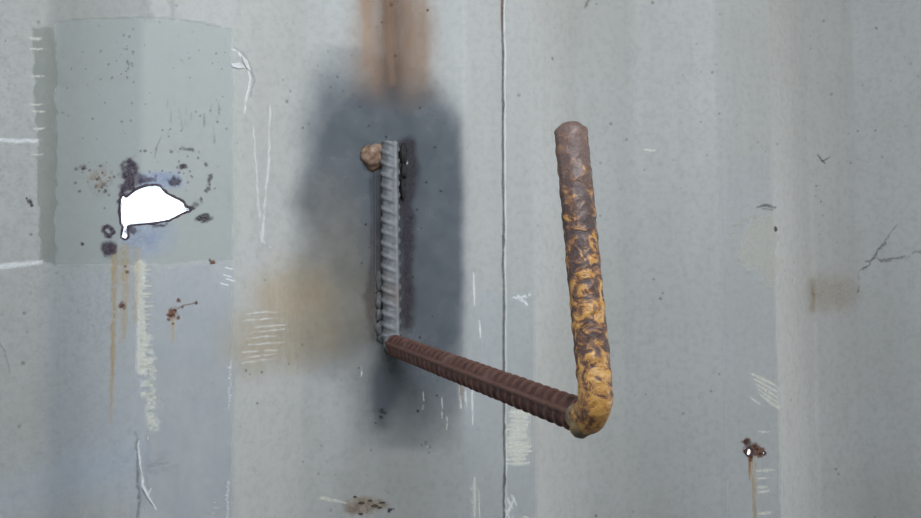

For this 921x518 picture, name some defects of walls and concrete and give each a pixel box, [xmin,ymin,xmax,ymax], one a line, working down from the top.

corrosion [372,0,419,81]
corrosion [743,439,764,494]
corrosion [349,496,394,515]